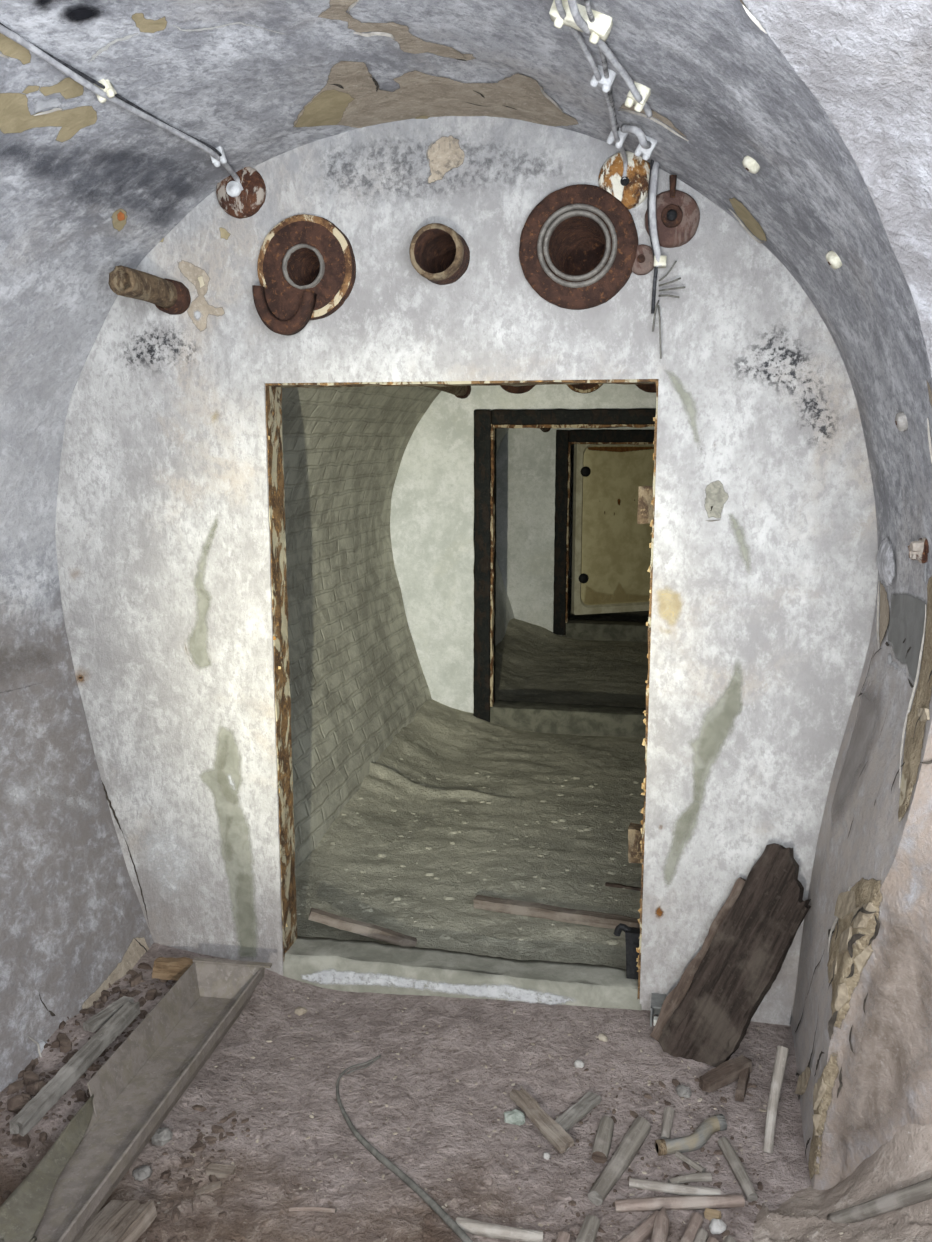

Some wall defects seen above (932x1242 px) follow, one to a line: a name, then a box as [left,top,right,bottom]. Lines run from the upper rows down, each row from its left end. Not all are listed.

peeling [318,0,476,61]
peeling [0,77,97,142]
peeling [293,61,578,128]
rust [257,214,352,318]
rust [409,223,464,281]
mould [737,337,832,438]
water stain [185,520,217,667]
peeling [877,581,890,647]
flaking render [898,576,932,821]
water stain [665,668,741,884]
water stain [201,727,257,957]